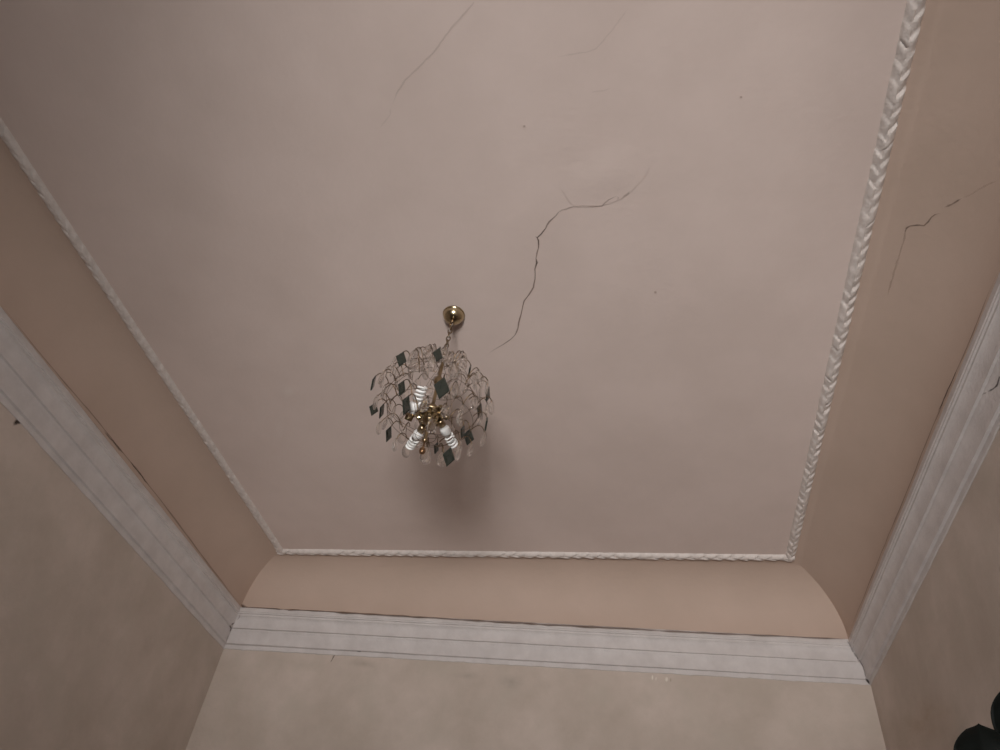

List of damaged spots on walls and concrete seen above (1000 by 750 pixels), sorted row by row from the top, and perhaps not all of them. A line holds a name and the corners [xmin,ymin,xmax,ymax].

crack [501,218,553,346]